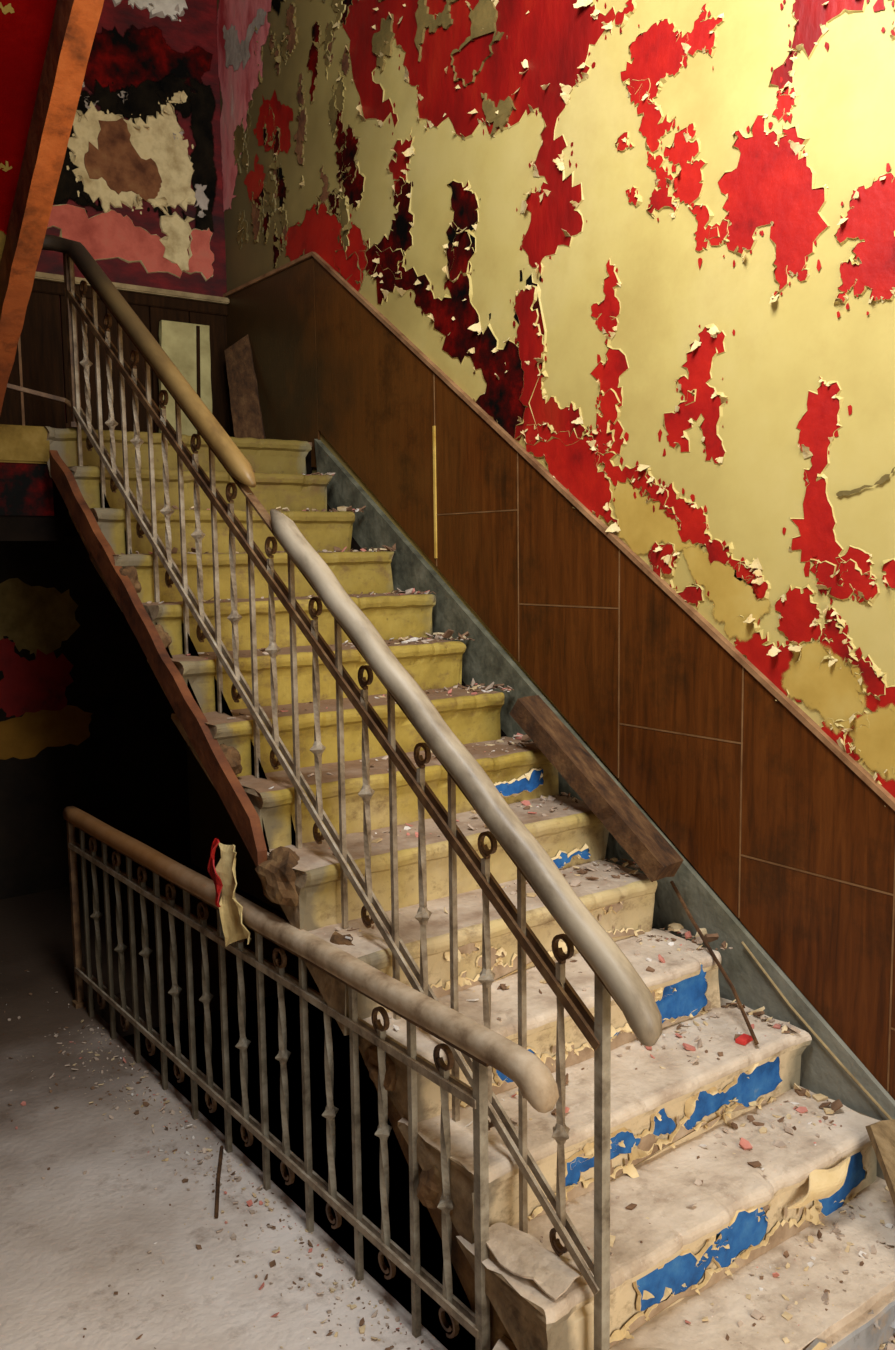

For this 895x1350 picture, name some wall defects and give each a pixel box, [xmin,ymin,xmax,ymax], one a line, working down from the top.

spalling [112,0,188,22]
spalling [47,82,214,281]
peeling [233,0,895,762]
peeling [0,578,93,760]
peeling [494,767,544,798]
peeling [551,843,591,869]
spalling [330,931,355,946]
peeling [650,963,711,1028]
peeling [527,1042,594,1073]
peeling [610,1056,783,1182]
peeling [528,1142,594,1221]
peeling [610,1151,867,1348]